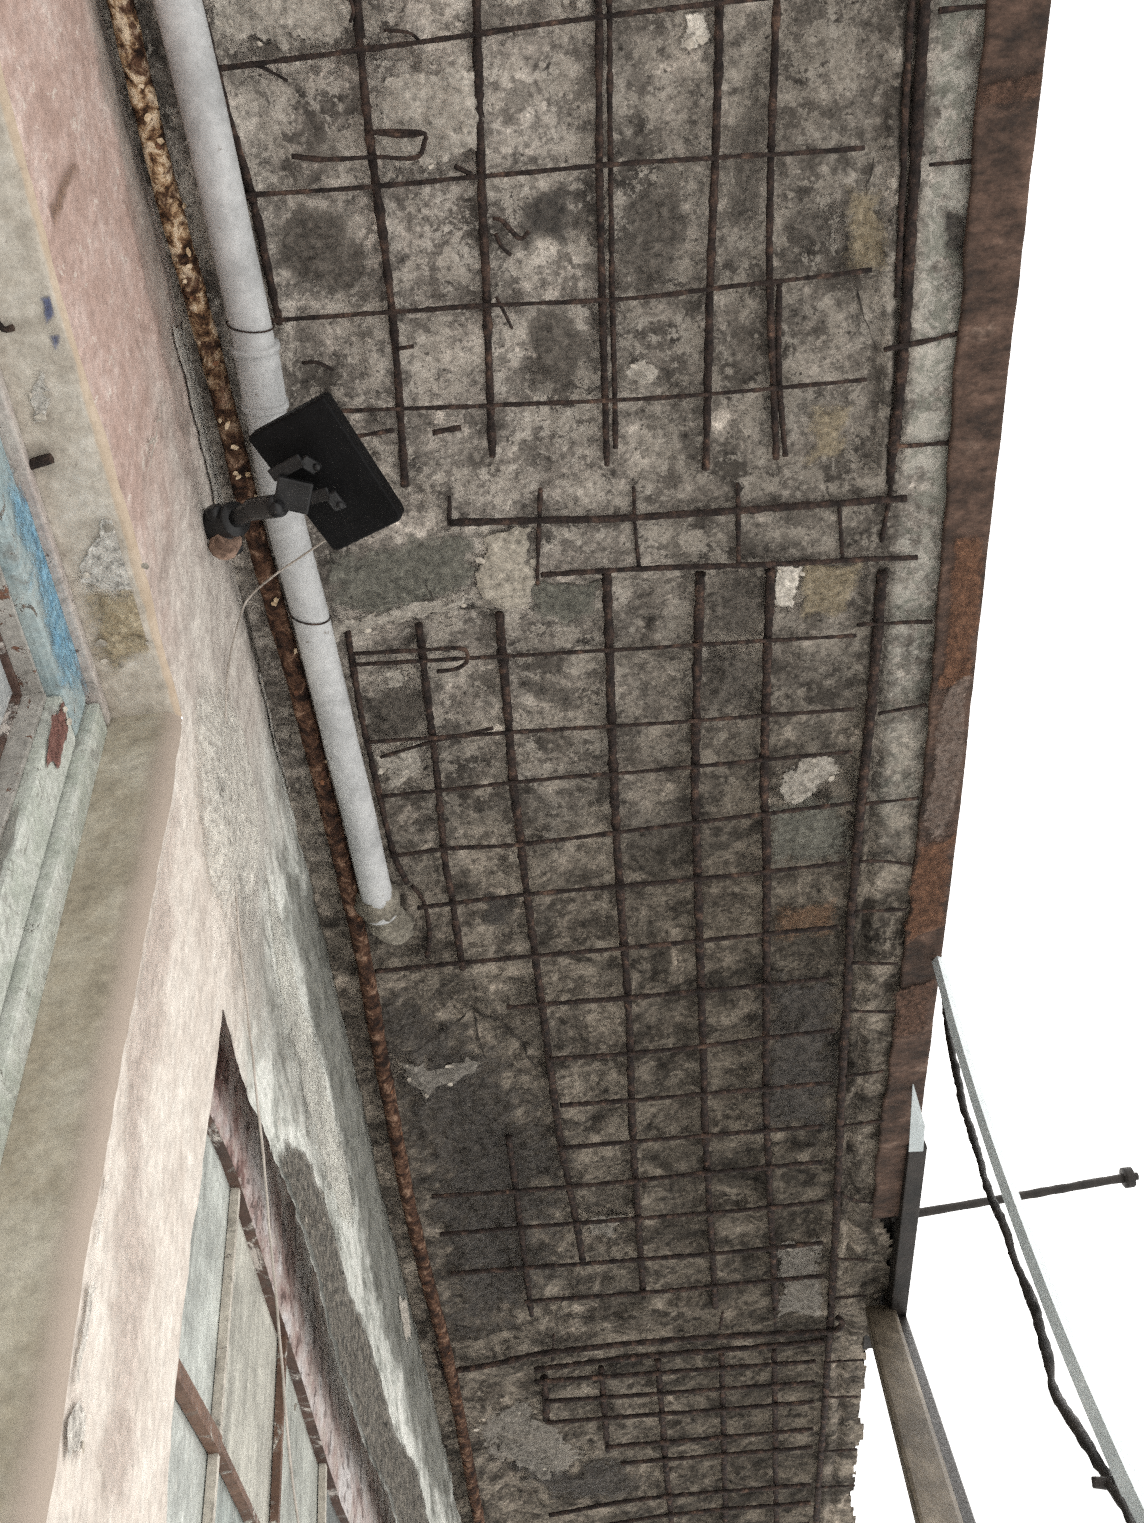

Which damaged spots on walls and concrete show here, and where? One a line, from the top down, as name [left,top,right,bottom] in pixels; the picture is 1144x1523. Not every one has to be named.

spalling [202,0,872,488]
spalling [173,323,251,504]
spalling [242,605,268,700]
damp [483,892,518,926]
spalling [332,0,932,1523]
damp [770,798,850,868]
peeling [925,676,971,837]
damp [755,972,842,1144]
damp [360,989,580,1338]
spalling [279,1138,430,1523]
damp [517,1456,641,1501]